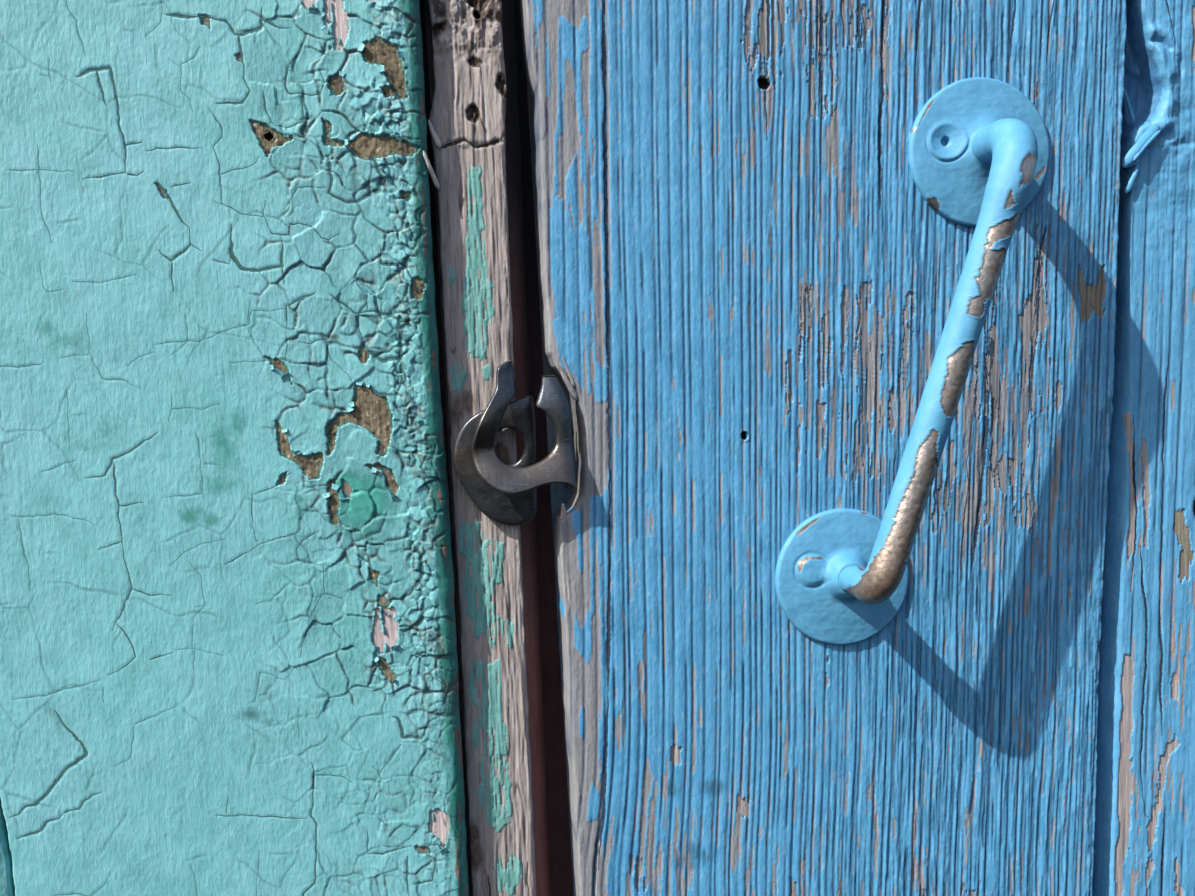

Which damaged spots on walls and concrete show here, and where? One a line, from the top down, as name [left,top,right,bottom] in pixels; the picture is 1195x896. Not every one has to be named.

crack [0,0,419,397]
peeling [322,119,420,161]
peeling [741,0,889,120]
peeling [276,381,399,525]
peeling [785,280,915,481]
crack [53,874,110,896]
crack [8,389,343,839]
crack [220,694,448,896]
crack [355,511,424,600]
peeling [458,520,520,832]
peeling [1114,654,1134,896]
crack [1130,353,1169,896]